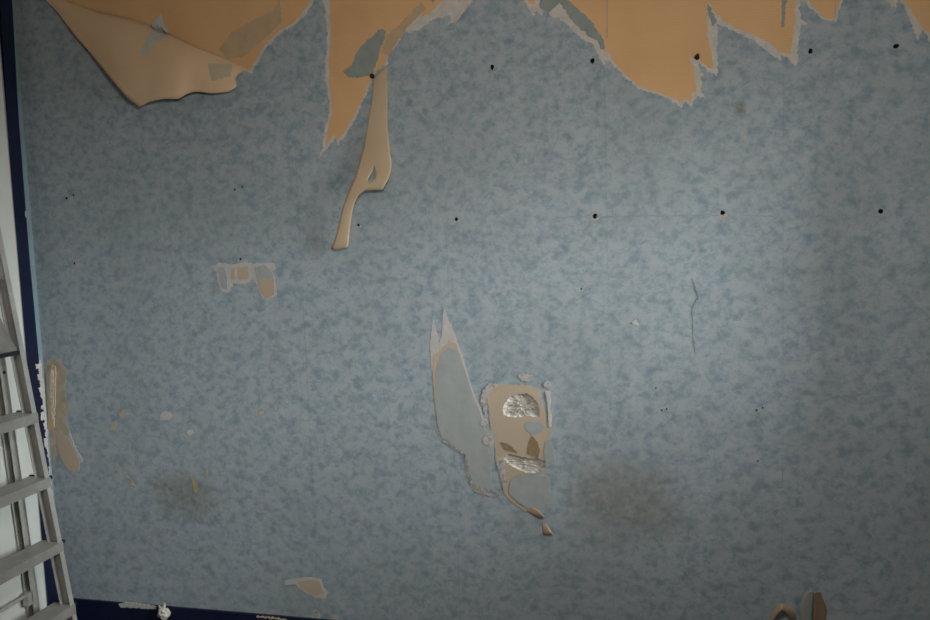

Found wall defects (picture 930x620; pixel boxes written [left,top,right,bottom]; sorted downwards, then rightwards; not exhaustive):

peeling [212,262,277,301]
crack [690,278,698,354]
peeling [430,307,555,512]
peeling [119,601,157,609]
peeling [284,577,328,599]